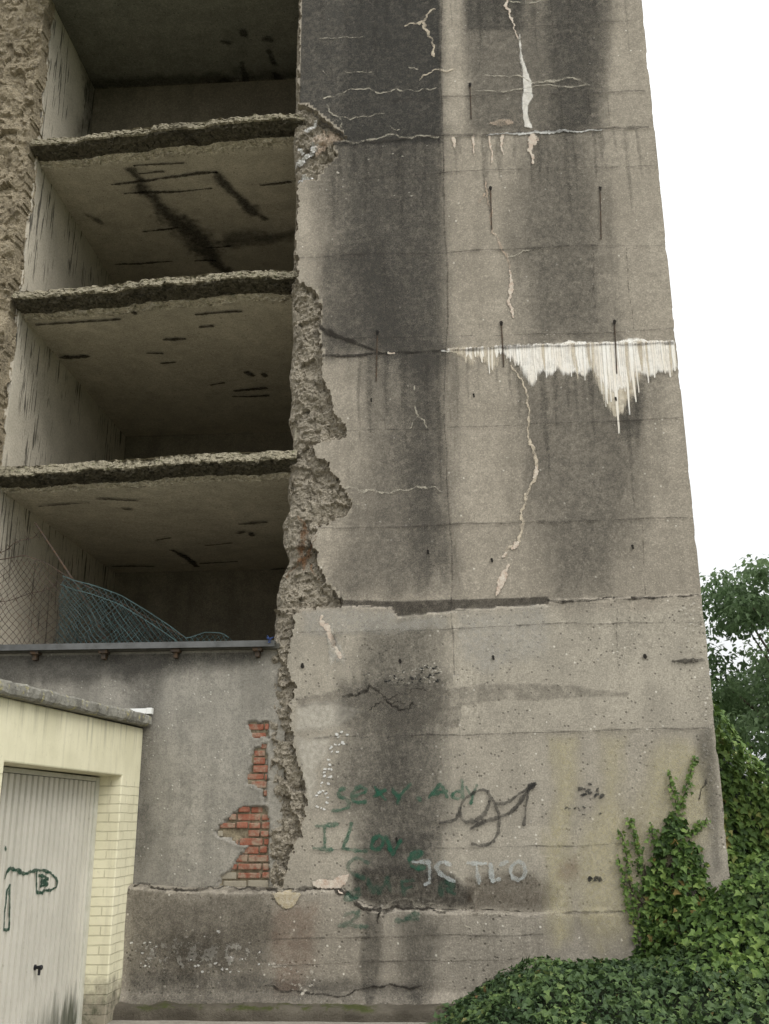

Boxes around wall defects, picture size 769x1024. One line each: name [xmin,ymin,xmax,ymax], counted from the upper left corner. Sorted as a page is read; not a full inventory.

crack [312,8,453,140]
leakage [93,0,677,584]
spalling [0,0,353,909]
crack [345,486,440,494]
crack [495,365,539,596]
crack [342,665,442,711]
crack [133,883,484,933]